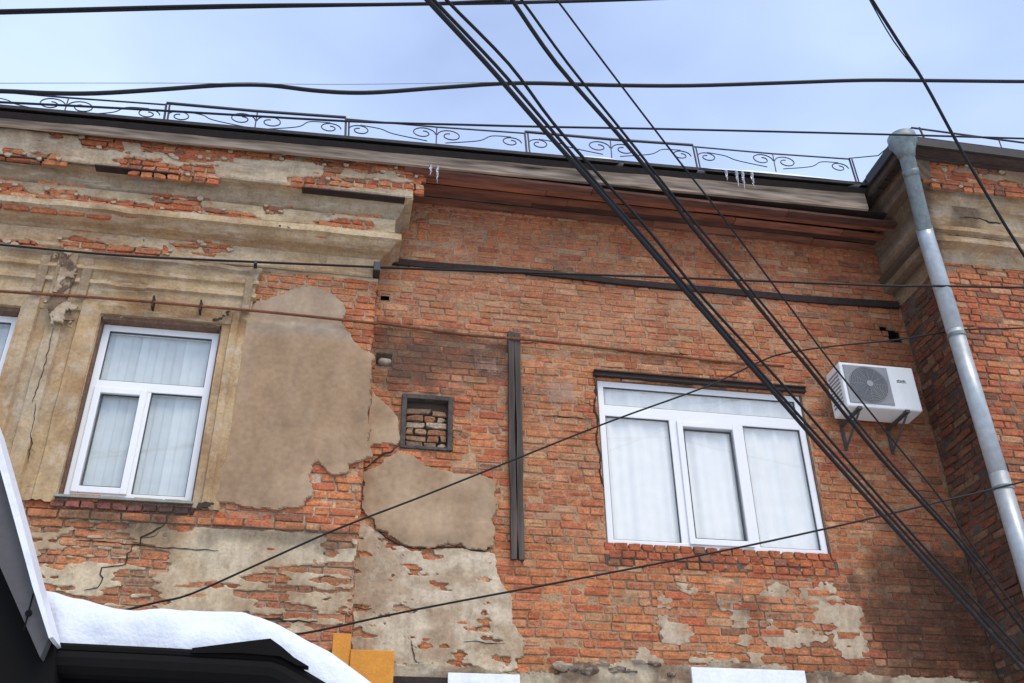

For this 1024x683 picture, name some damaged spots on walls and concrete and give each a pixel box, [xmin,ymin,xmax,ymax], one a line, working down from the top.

spalling [0,131,426,328]
crack [28,328,54,460]
peeling [29,286,525,673]
crack [76,515,218,590]
peeling [656,581,871,665]